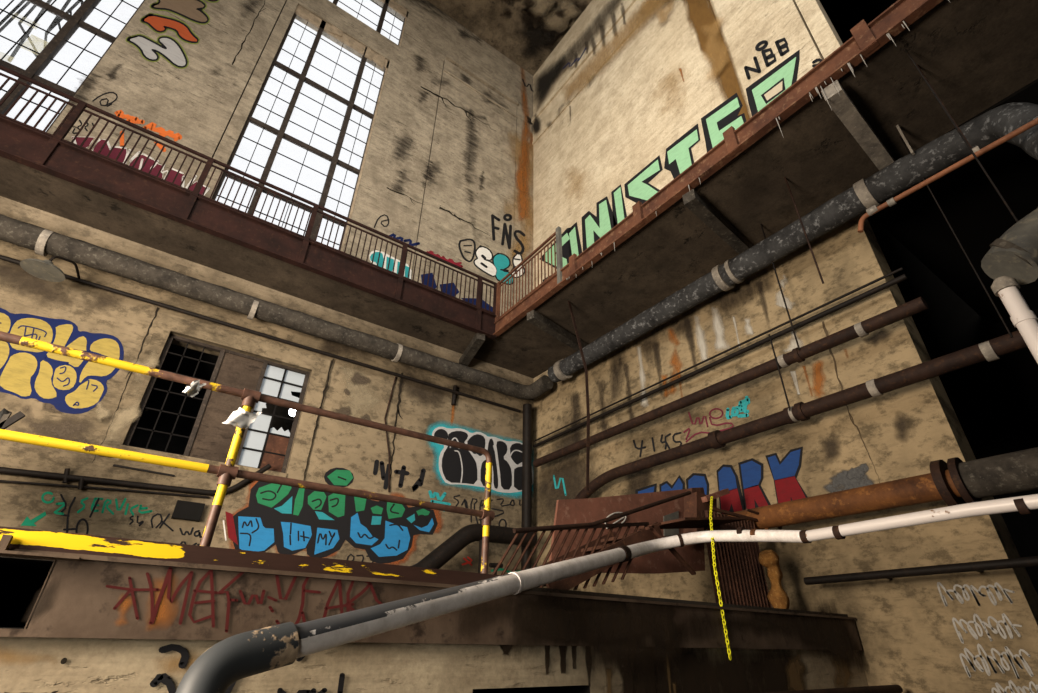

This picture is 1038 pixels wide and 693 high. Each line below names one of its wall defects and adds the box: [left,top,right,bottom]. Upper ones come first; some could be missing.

water stain [556,0,671,96]
water stain [683,0,751,121]
rust [516,68,533,219]